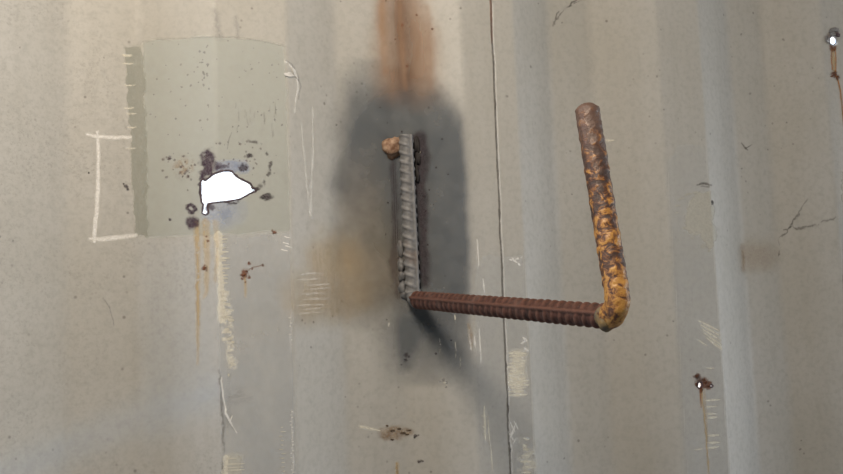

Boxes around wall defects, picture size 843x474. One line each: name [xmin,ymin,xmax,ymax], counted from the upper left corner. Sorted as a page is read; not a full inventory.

rust [385,0,433,87]
rust [830,45,843,115]
rust [695,374,711,421]
rust [360,425,419,441]